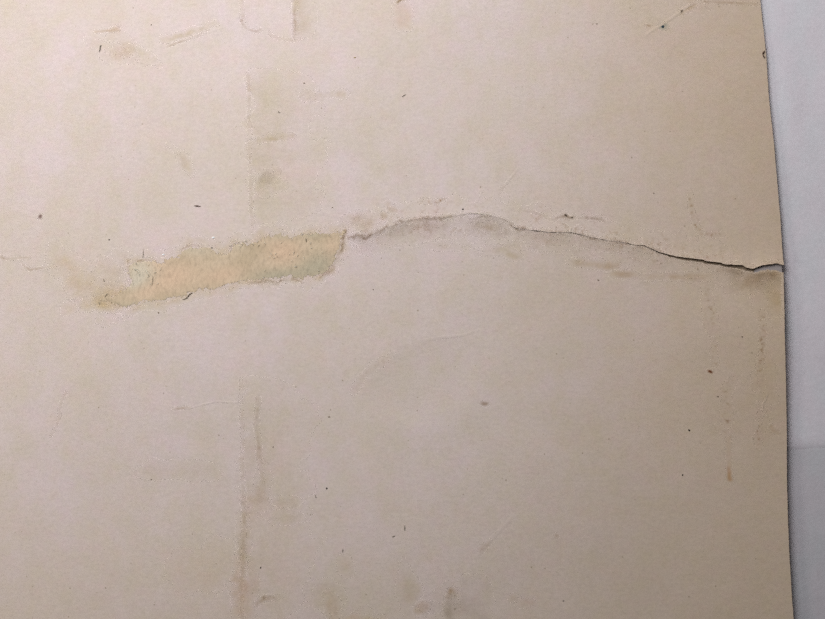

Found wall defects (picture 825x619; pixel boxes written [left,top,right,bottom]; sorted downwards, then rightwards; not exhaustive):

peeling [99,230,346,308]